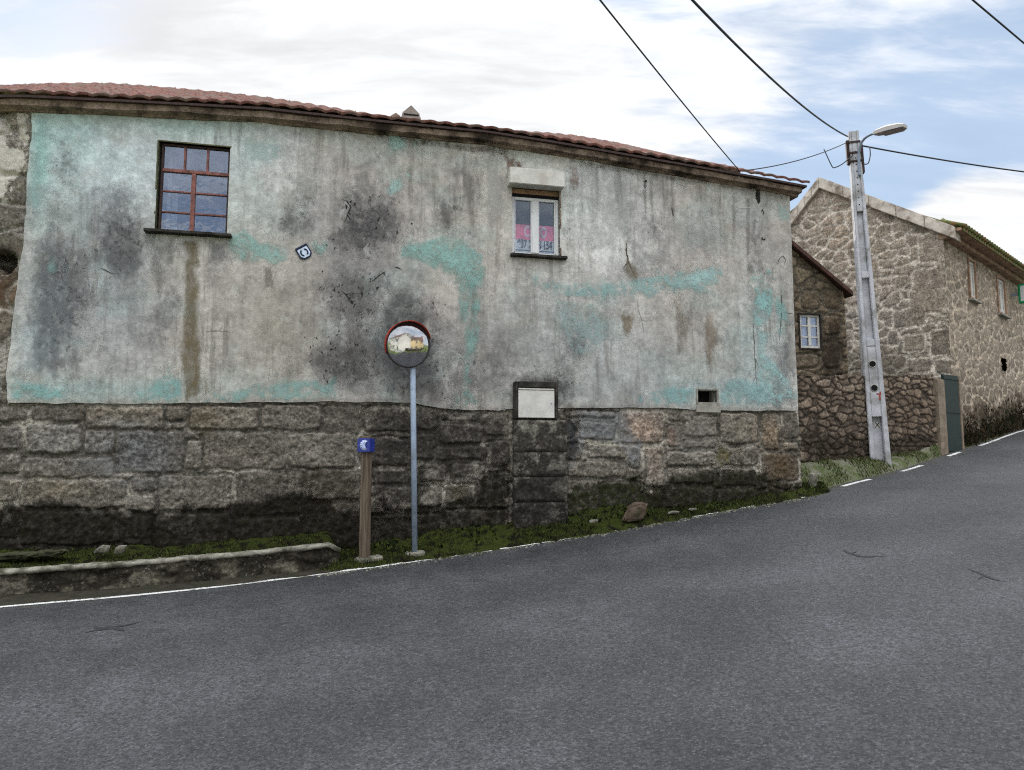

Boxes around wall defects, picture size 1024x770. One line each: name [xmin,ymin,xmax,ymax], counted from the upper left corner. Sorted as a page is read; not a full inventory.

flaking render [0,112,62,398]
damp [304,271,445,399]